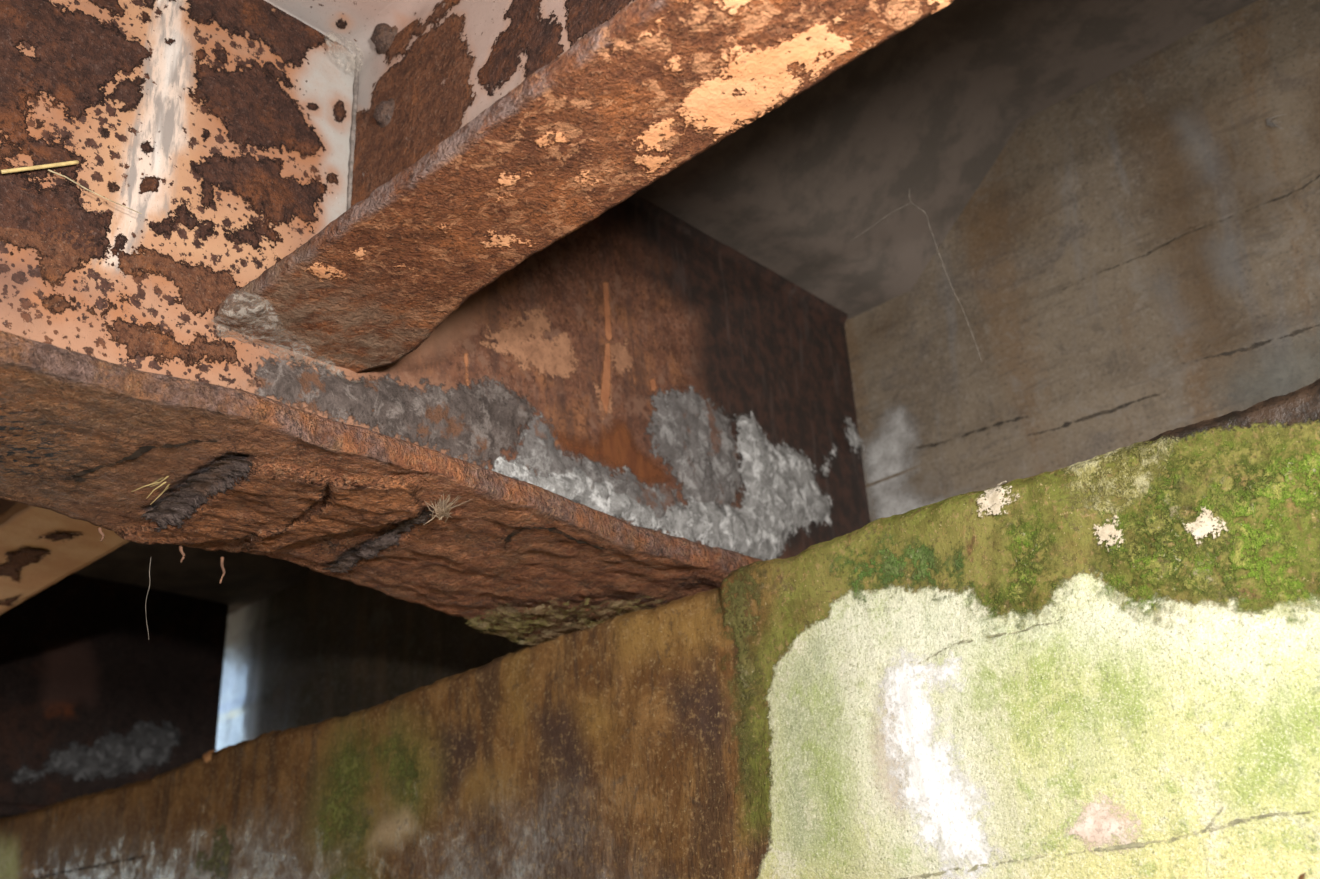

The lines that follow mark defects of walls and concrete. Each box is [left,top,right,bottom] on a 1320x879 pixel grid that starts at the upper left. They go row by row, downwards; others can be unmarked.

peeling [713,0,754,20]
peeling [624,7,858,179]
peeling [535,131,574,148]
rust [0,0,634,369]
peeling [492,172,532,202]
crack [1062,174,1320,290]
crack [1196,325,1320,361]
rust [555,282,664,484]
crack [915,394,1160,449]
rust [0,528,105,606]
damp [0,378,1320,879]
crack [899,807,1310,879]